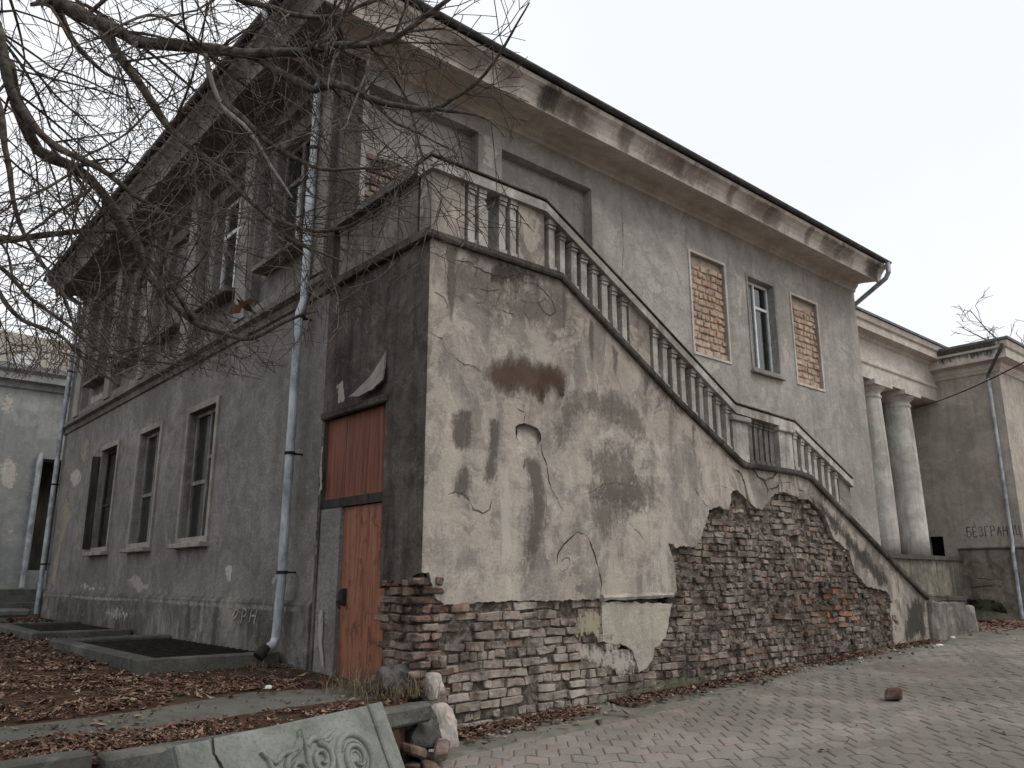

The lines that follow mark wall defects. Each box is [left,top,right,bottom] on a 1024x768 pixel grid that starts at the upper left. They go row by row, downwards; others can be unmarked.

leakage [537,83,594,132]
leakage [647,147,710,186]
leakage [866,258,882,280]
peeling [337,351,387,403]
leakage [453,410,471,449]
spalling [515,409,541,455]
peeling [0,456,18,489]
leakage [437,419,513,566]
leakage [524,458,547,554]
leakage [558,390,655,541]
crack [557,531,602,587]
spalling [371,469,899,729]